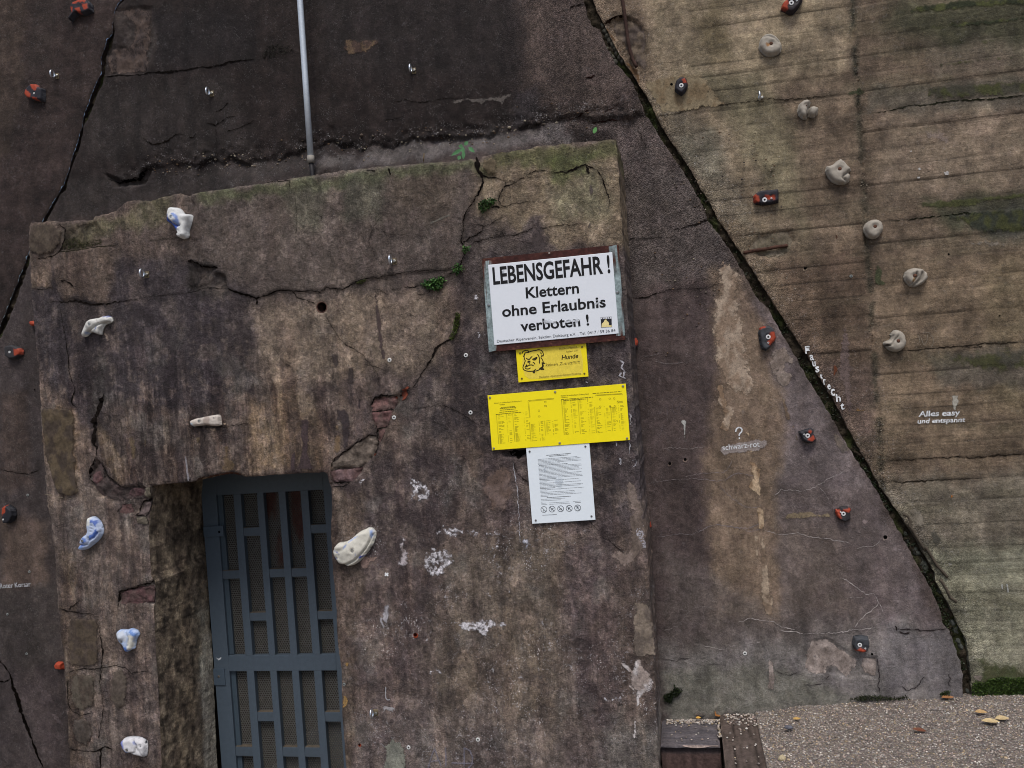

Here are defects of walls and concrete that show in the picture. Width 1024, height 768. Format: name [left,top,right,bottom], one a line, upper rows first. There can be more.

crack [1,157,610,516]
spalling [330,386,409,486]
spalling [93,463,152,524]
efflorescence [424,548,452,576]
efflorescence [456,620,505,635]
crack [0,661,43,767]
efflorescence [621,660,652,738]